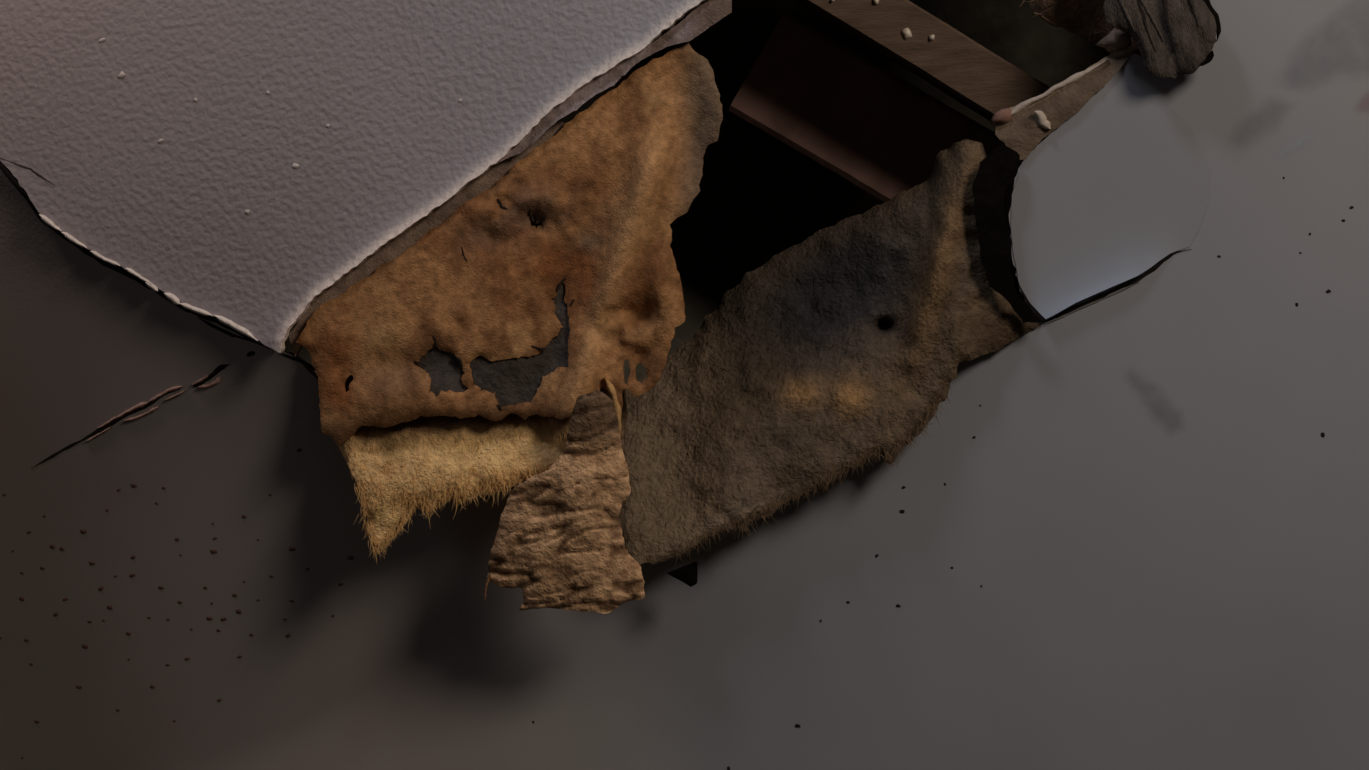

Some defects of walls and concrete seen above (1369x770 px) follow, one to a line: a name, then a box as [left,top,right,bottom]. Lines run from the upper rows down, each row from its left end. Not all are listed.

crack [0,158,315,468]
peeling [1011,84,1210,319]